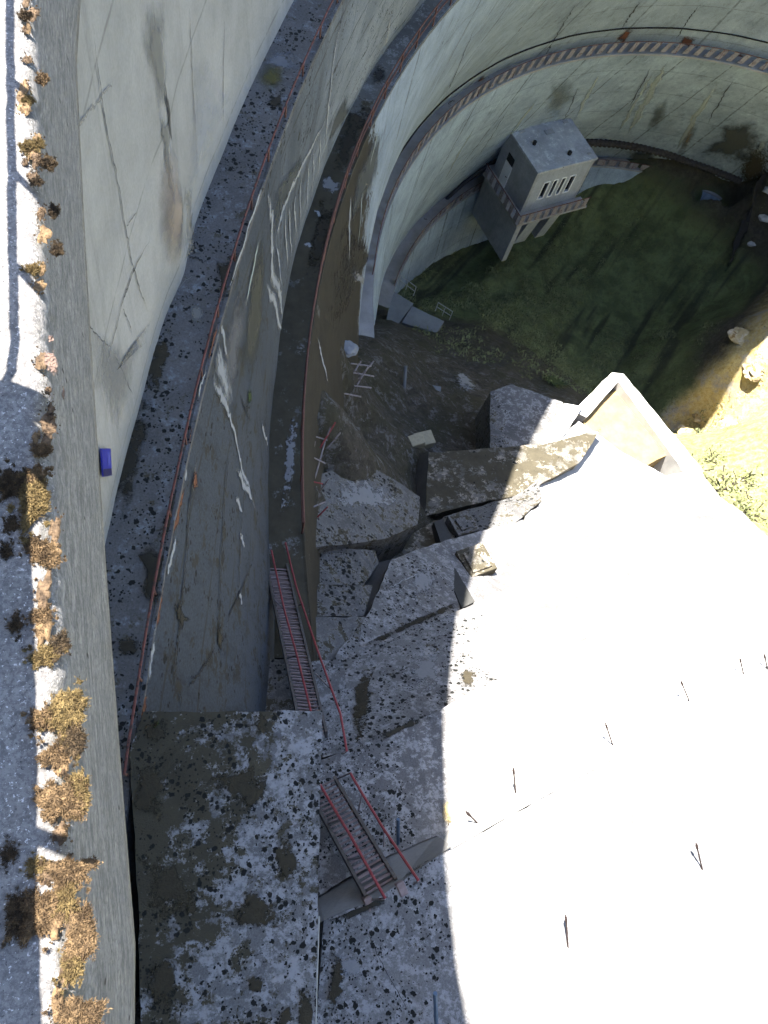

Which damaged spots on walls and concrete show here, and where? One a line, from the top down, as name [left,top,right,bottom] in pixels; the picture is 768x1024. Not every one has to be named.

crack [80,64,144,357]
leakage [150,17,173,191]
leakage [704,125,765,161]